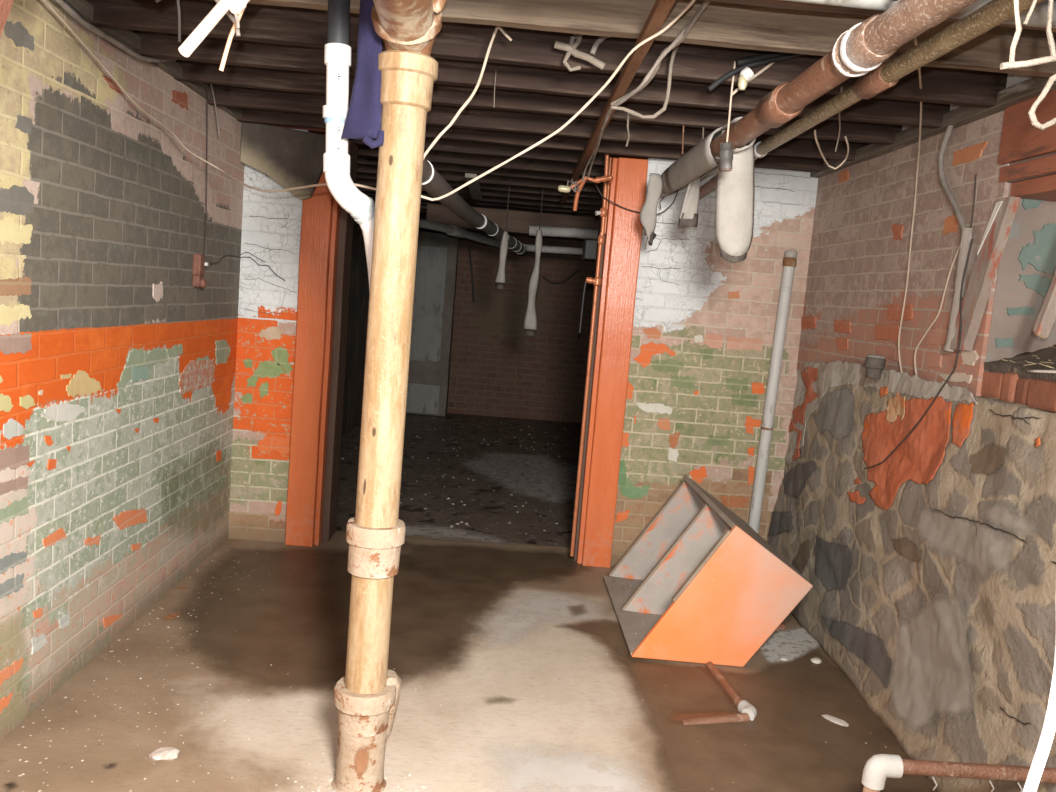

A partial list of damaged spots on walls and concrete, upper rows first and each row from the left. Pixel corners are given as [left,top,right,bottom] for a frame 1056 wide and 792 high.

peeling [0,185,34,245]
flaking render [0,276,32,355]
peeling [117,339,231,395]
peeling [241,326,293,404]
flaking render [0,370,101,524]
peeling [615,382,680,523]
peeling [847,387,974,510]
peeling [0,550,27,599]
damp [181,550,352,688]
damp [388,544,910,792]
corrosion [355,749,368,774]
damp [880,774,937,792]